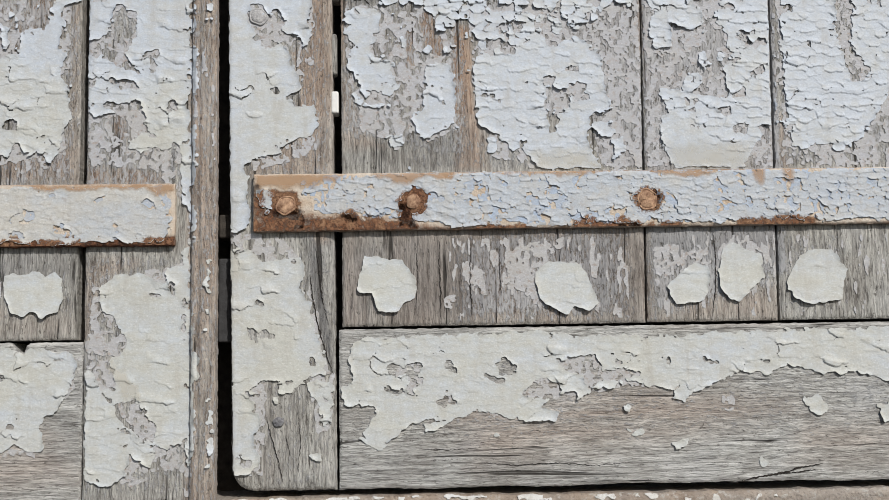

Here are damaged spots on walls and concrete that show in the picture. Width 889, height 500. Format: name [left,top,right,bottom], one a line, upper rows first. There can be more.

corrosion [0,239,81,247]
corrosion [32,184,172,194]
peeling [0,0,215,487]
corrosion [142,236,173,245]
corrosion [253,173,453,231]
peeling [229,0,889,477]
corrosion [574,185,682,227]
corrosion [737,214,818,224]